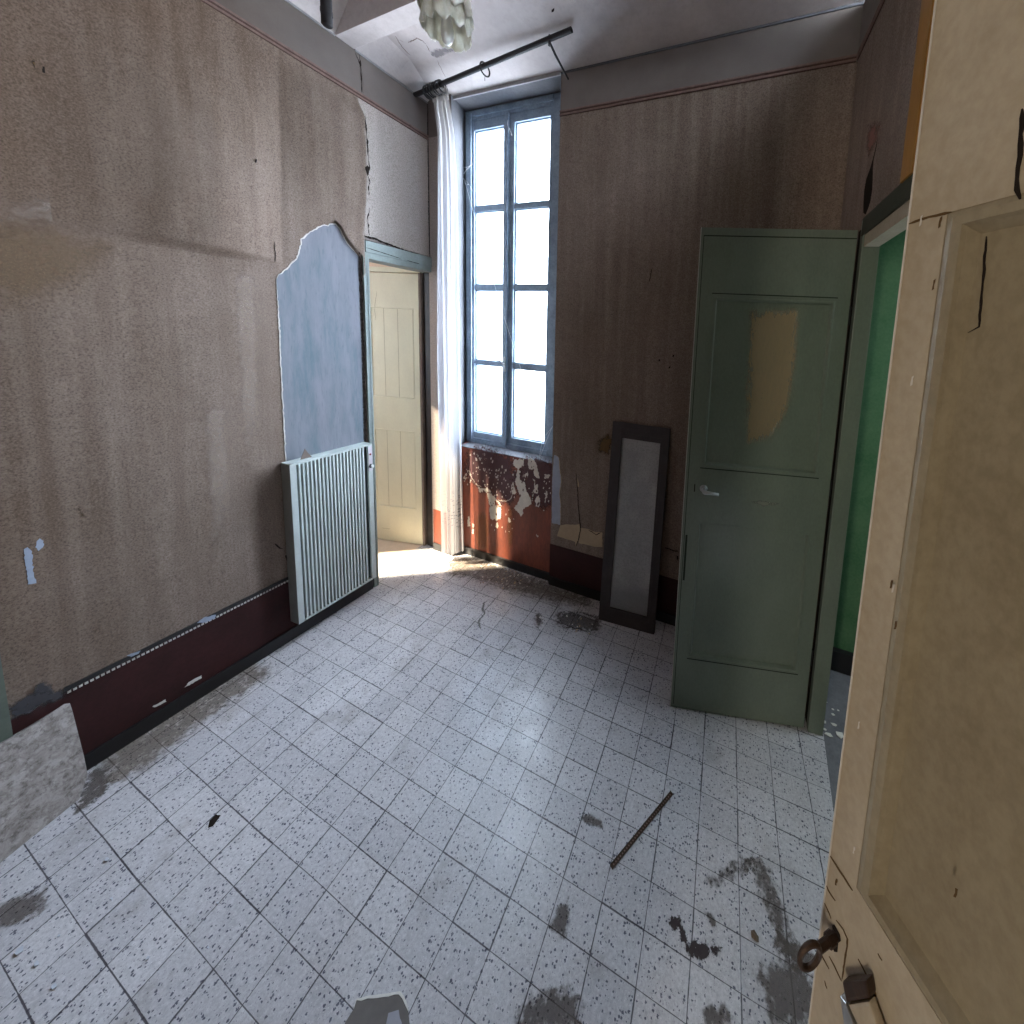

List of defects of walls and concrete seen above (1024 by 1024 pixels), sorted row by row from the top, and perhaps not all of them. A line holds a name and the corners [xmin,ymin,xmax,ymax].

crack [355,53,370,236]
crack [1014,108,1024,200]
peeling [276,224,364,461]
peeling [463,453,562,533]
peeling [24,538,44,584]
damp [449,558,601,632]
damp [0,888,48,926]
damp [669,915,722,960]
damp [708,856,814,1024]
damp [703,1005,731,1024]